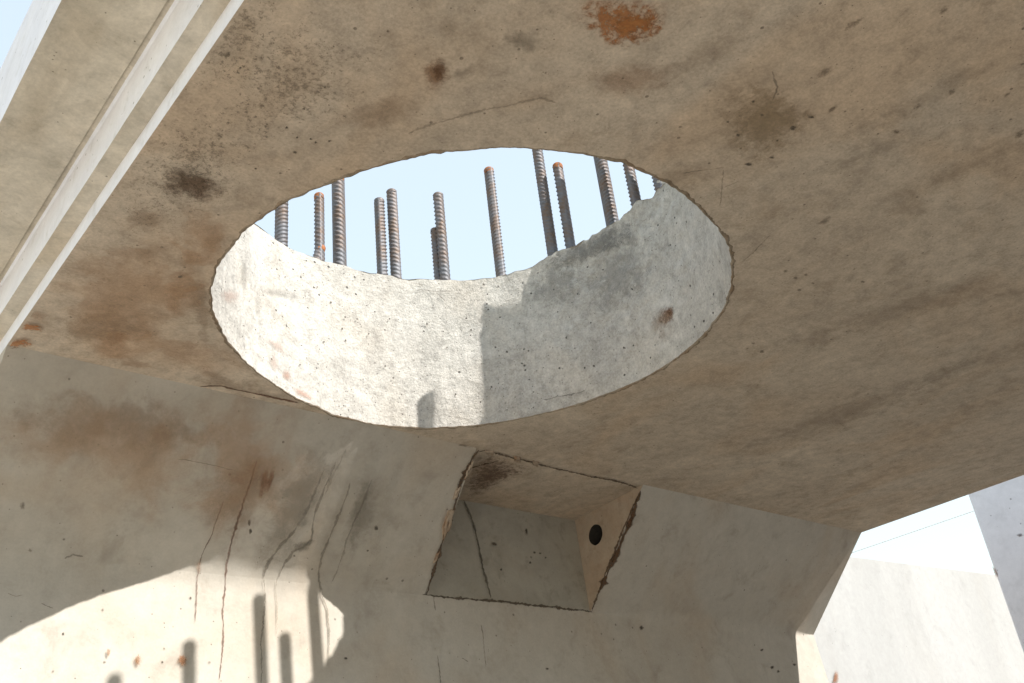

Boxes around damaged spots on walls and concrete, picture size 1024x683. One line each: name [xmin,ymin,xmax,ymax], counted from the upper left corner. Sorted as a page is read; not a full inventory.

corrosion [584,3,661,45]
leakage [426,59,444,82]
mould [170,173,217,200]
corrosion [10,324,40,348]
crack [195,462,273,678]